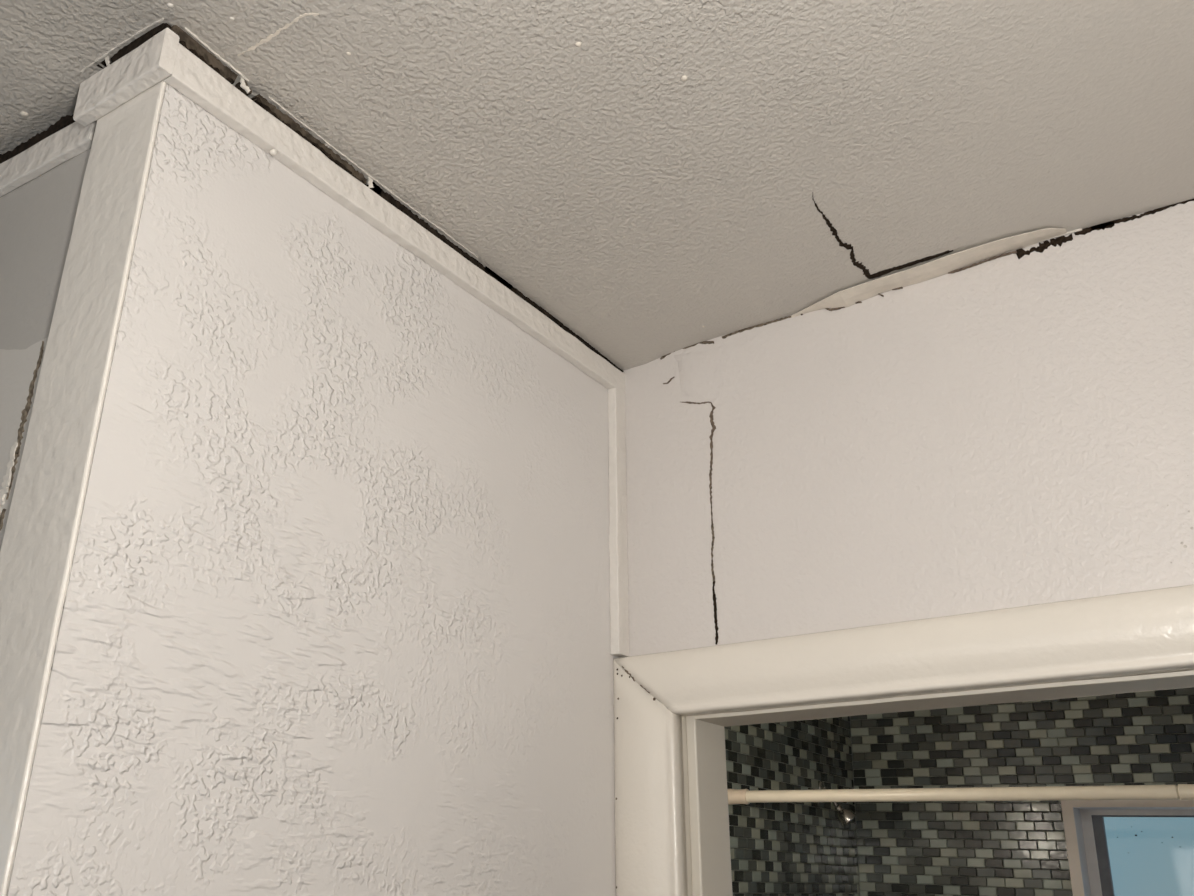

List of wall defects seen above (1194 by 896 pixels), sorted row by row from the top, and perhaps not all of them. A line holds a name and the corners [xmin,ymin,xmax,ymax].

crack [0,114,75,164]
crack [81,18,624,372]
crack [660,195,1017,645]